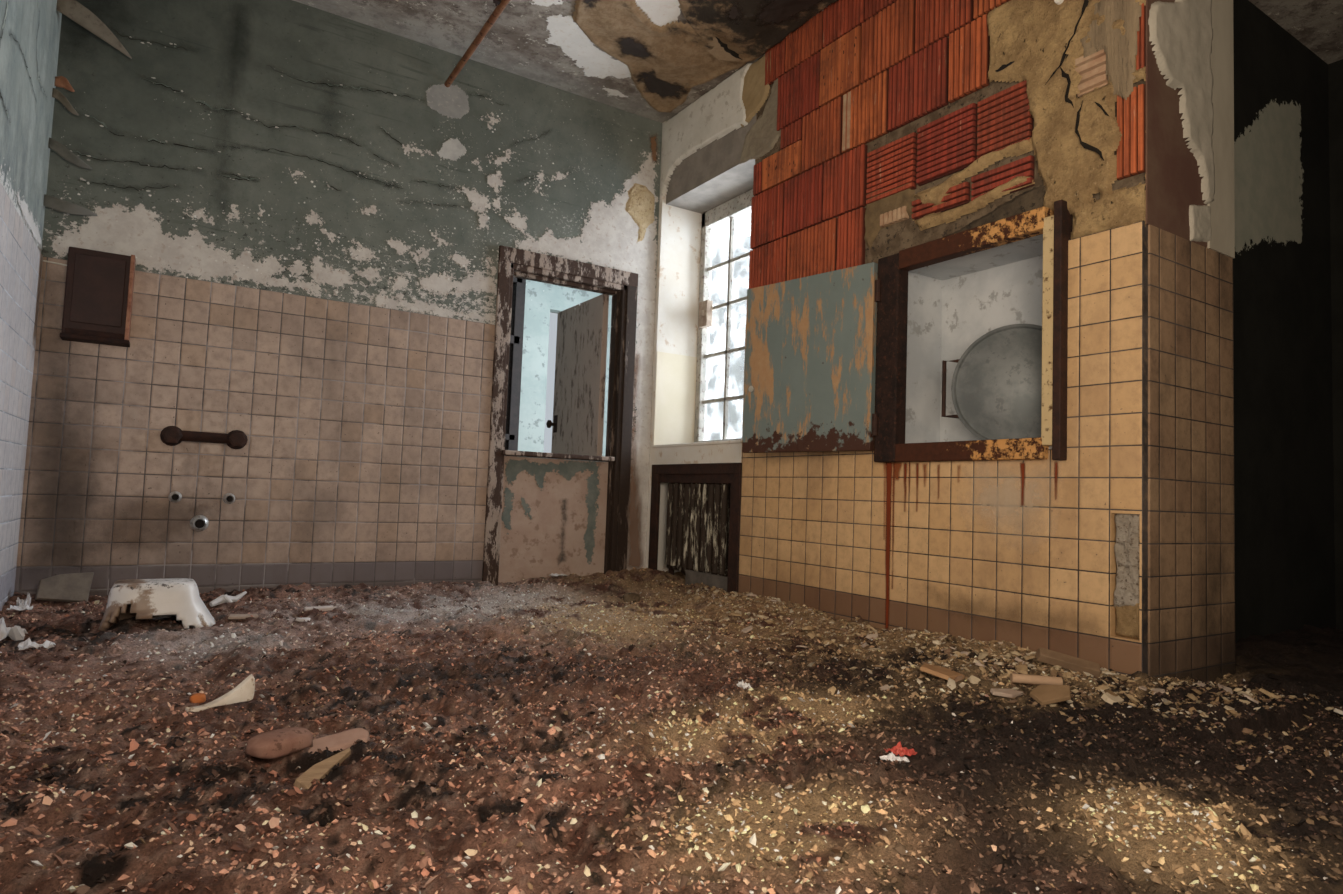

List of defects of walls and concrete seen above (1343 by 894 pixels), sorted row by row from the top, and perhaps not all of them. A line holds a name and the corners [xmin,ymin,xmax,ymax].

crack [0,0,46,121]
crack [69,29,465,208]
crack [1045,0,1111,161]
flaking render [1,0,1215,570]
corrosion [884,462,939,629]
peeling [1113,513,1139,639]